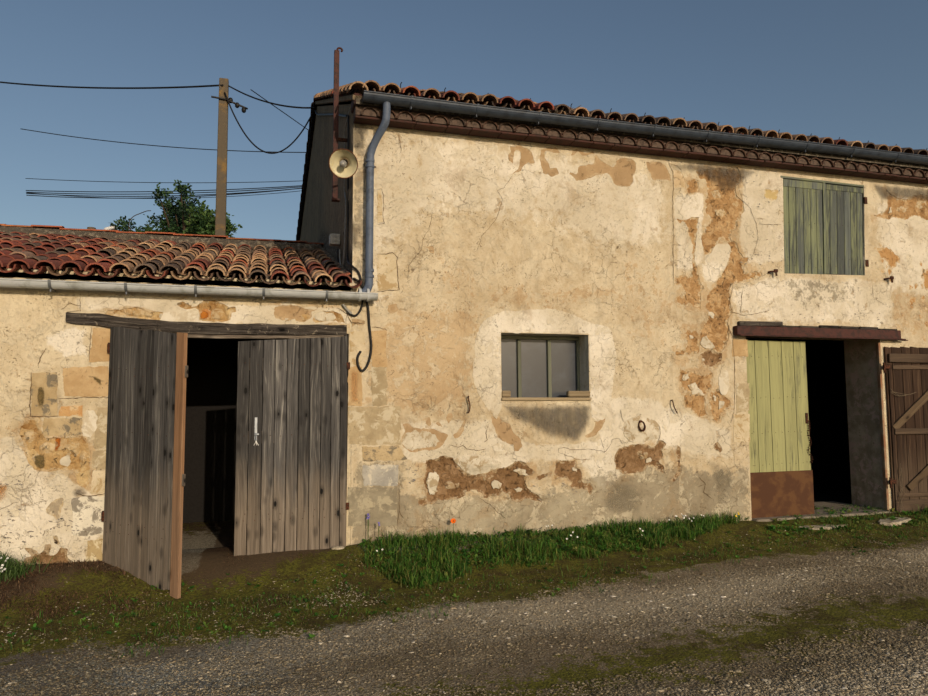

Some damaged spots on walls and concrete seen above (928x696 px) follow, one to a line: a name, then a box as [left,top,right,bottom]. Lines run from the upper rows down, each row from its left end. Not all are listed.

flaking render [508,143,560,177]
flaking render [570,149,671,187]
flaking render [874,190,928,220]
flaking render [675,167,782,422]
flaking render [907,261,928,342]
water stain [511,408,587,438]
flaking render [19,417,91,489]
flaking render [401,413,593,506]
flaking render [614,440,682,482]